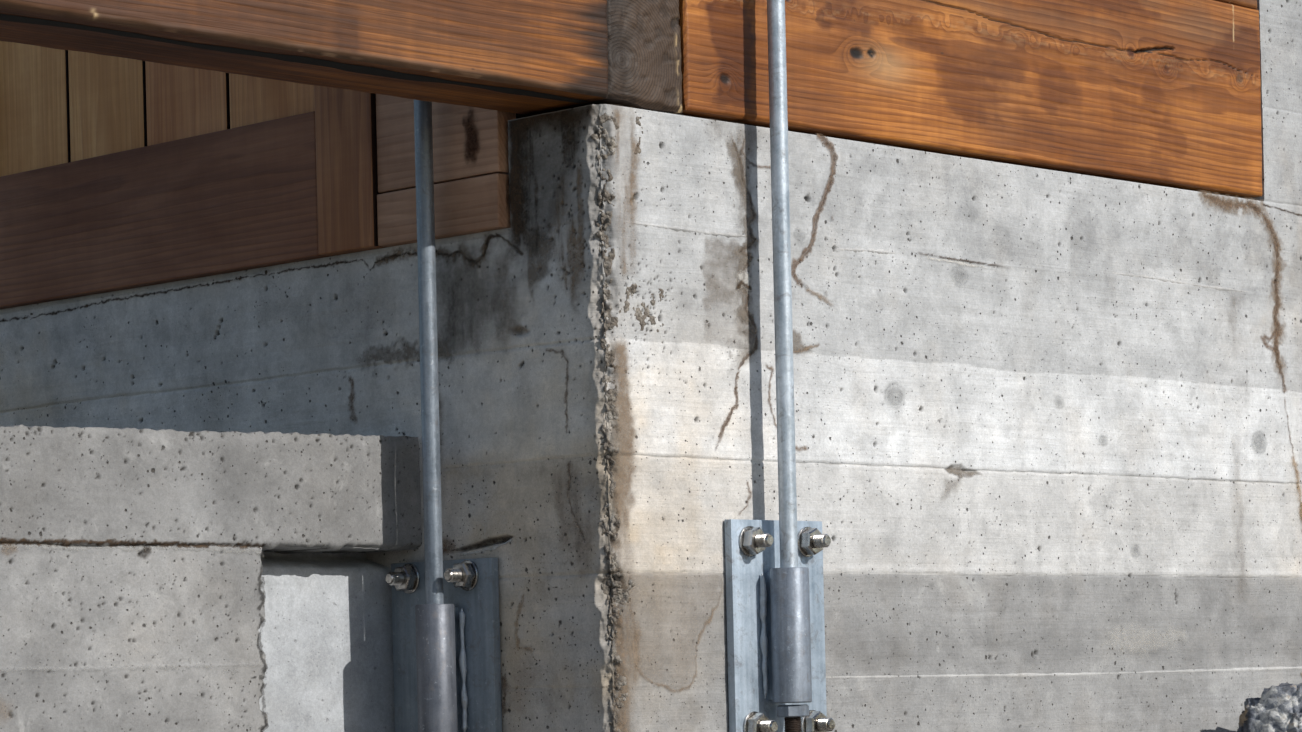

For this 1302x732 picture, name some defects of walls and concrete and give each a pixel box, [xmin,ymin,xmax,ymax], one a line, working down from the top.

crack [0,233,523,322]
water stain [365,339,420,363]
water stain [508,105,592,297]
water stain [615,111,637,213]
spalling [591,113,664,732]
crack [719,139,777,436]
crack [791,133,837,301]
crack [1201,191,1302,518]
crack [0,538,265,554]